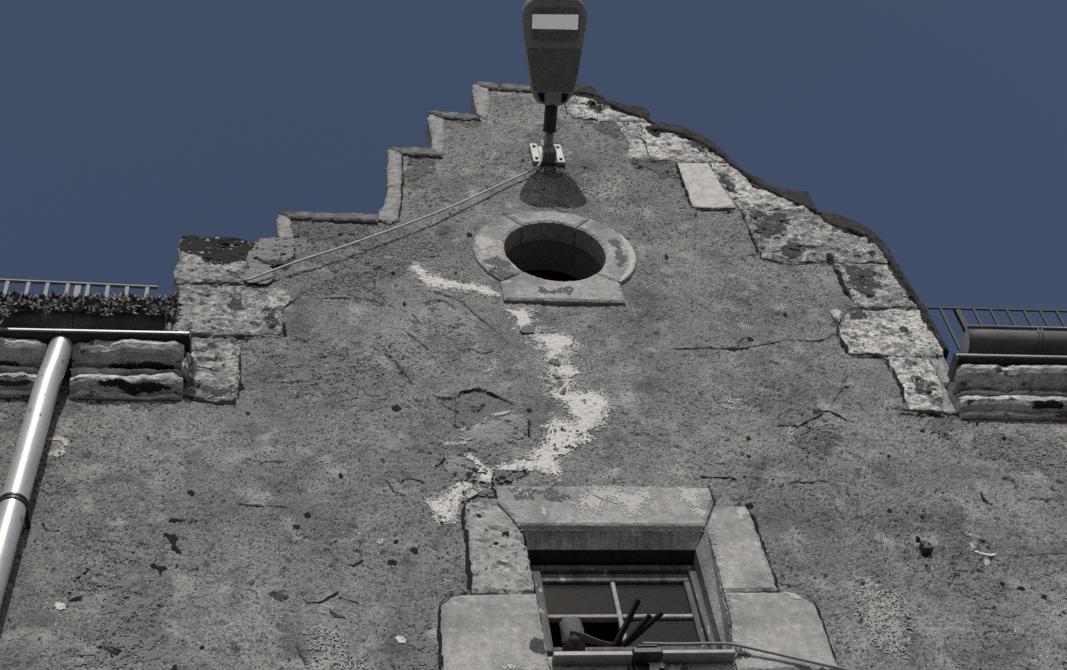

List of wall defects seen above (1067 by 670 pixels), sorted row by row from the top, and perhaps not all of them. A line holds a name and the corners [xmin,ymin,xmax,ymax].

spalling [243,236,296,284]
damp [482,255,516,279]
spalling [780,241,806,258]
crack [628,122,979,427]
damp [538,286,575,295]
spalling [187,383,245,405]
peeling [399,261,615,530]
damp [508,486,571,502]